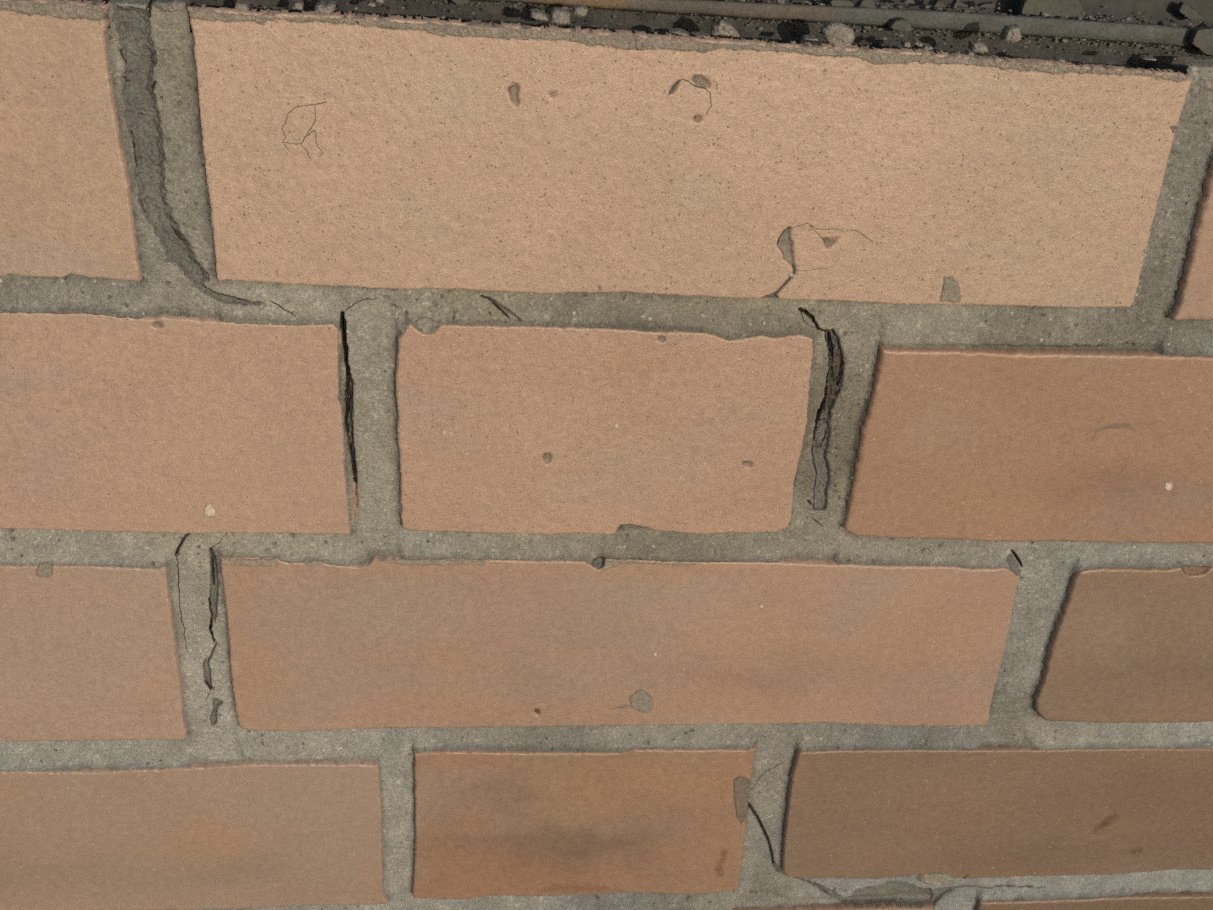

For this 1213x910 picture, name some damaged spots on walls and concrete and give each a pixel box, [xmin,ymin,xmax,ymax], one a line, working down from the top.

spalling [765,223,873,298]
crack [341,298,399,523]
crack [799,308,844,527]
crack [175,532,228,725]
crack [748,762,829,894]